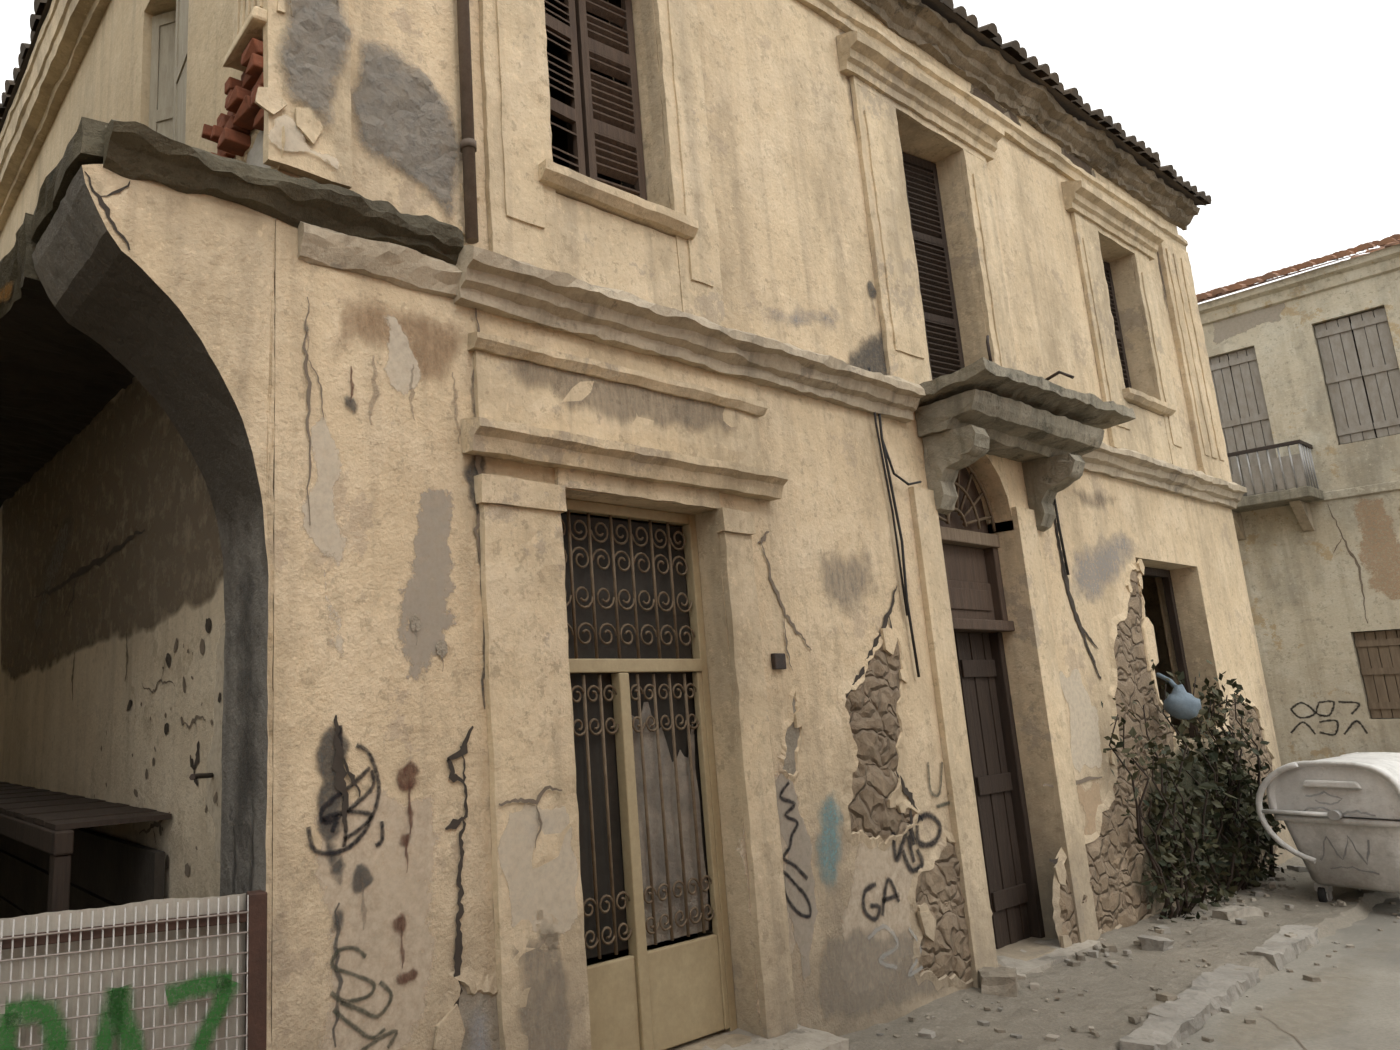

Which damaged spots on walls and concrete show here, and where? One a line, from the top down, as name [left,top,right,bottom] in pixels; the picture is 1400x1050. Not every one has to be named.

flaking render [201,0,481,212]
crack [34,529,145,617]
crack [142,663,175,693]
crack [182,715,206,730]
peeling [398,489,457,680]
crack [758,531,812,671]
flaking render [837,625,921,852]
crack [1053,502,1101,679]
flaking render [1052,559,1177,948]
crack [1328,505,1368,623]
peeling [316,761,500,1050]
flaking render [907,827,974,993]